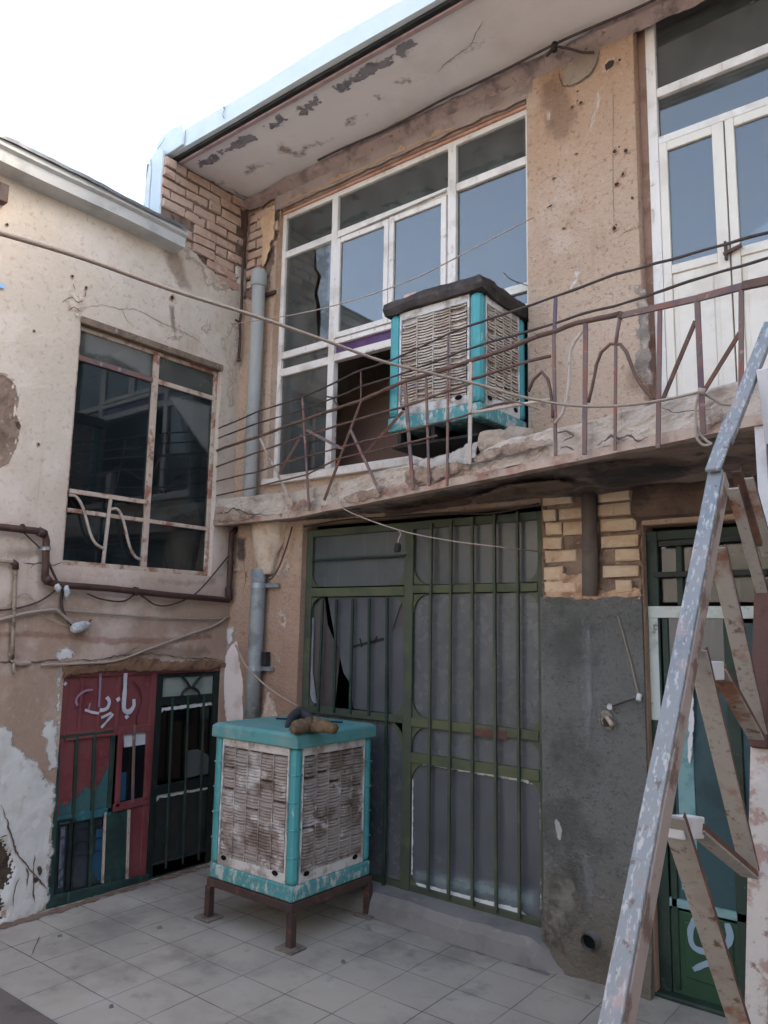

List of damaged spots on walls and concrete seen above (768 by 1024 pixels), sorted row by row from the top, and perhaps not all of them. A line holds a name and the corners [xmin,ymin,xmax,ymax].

flaking render [332,39,418,93]
flaking render [161,94,322,300]
crack [62,284,203,346]
flaking render [635,285,653,385]
flaking render [0,375,21,468]
spalling [404,439,552,484]
flaking render [0,626,243,924]